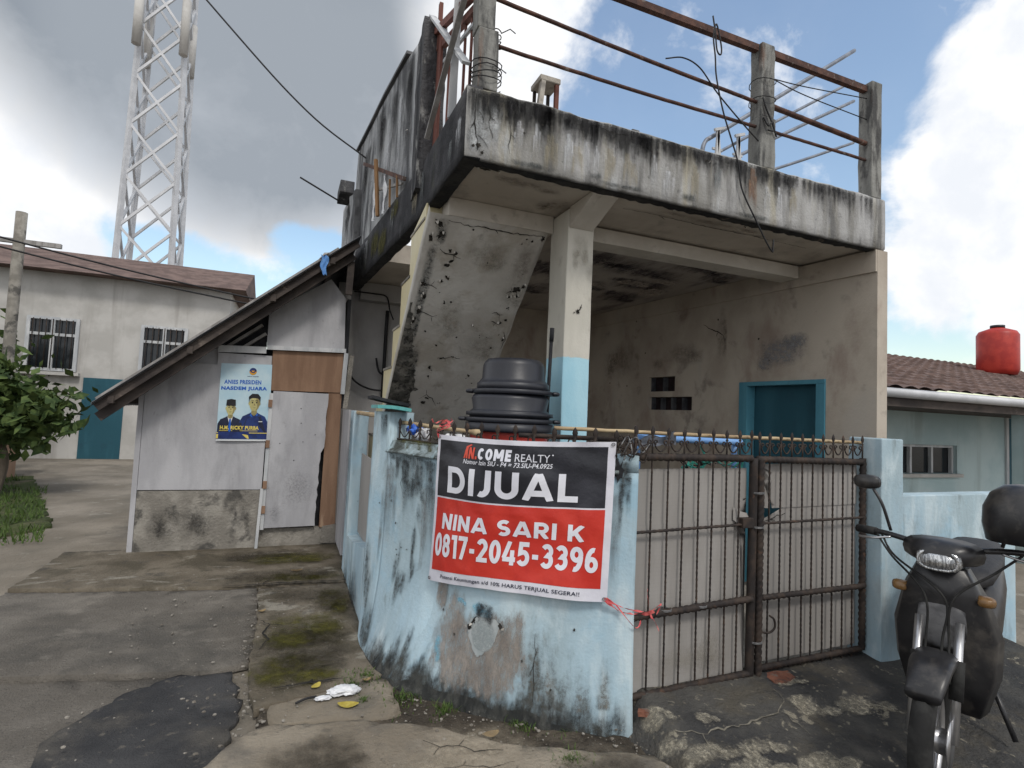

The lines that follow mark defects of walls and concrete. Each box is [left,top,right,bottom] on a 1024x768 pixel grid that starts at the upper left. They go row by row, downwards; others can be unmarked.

leakage [363,55,414,192]
crack [471,94,513,153]
leakage [456,87,873,210]
spalling [385,219,458,412]
leakage [385,444,435,597]
leakage [344,551,621,737]
peeling [429,583,565,711]